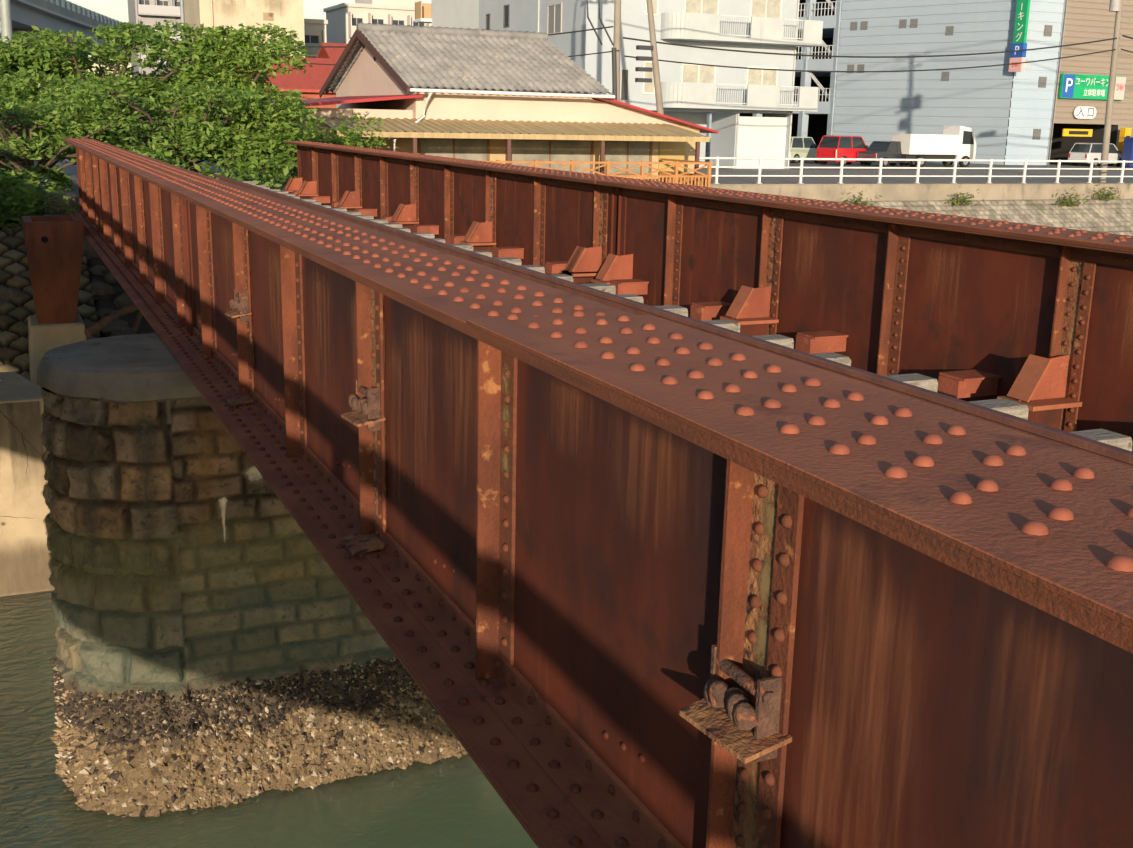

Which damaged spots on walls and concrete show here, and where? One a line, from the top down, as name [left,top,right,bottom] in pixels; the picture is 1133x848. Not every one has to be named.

peeling [753,555,772,671]